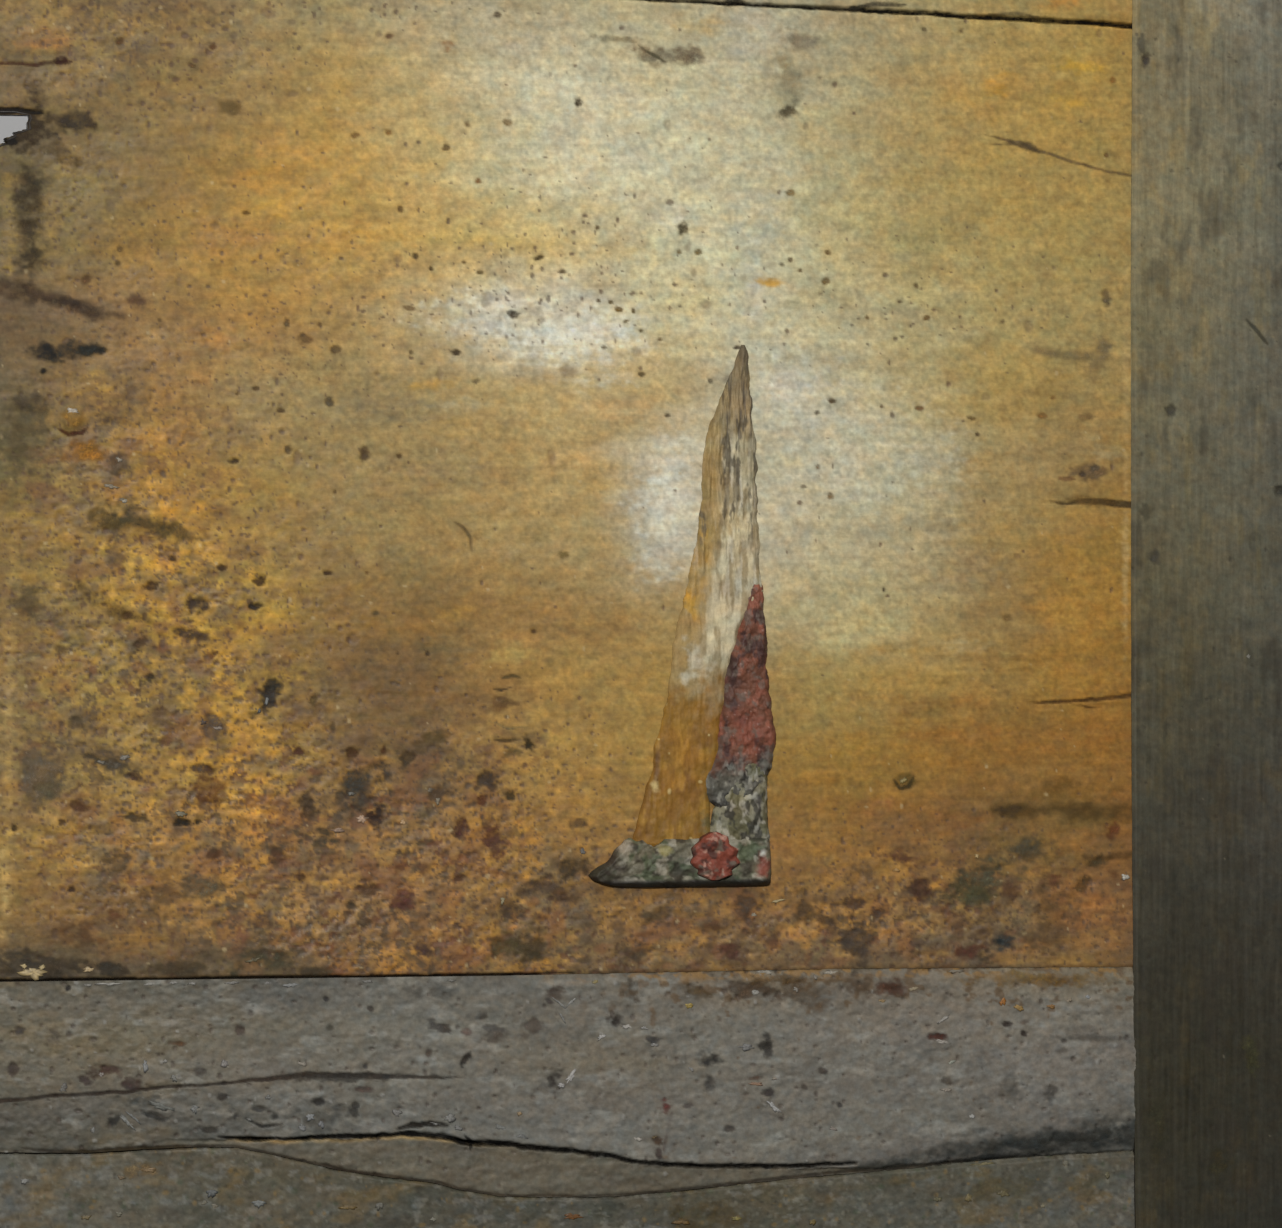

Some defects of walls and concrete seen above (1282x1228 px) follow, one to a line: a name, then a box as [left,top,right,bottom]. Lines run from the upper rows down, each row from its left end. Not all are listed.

crack [644,0,1131,29]
damp [0,92,97,154]
damp [14,166,42,268]
damp [0,285,100,318]
damp [39,340,106,373]
corrosion [188,599,208,613]
corrosion [174,628,207,640]
corrosion [251,679,281,719]
corrosion [299,748,415,846]
corrosion [477,771,515,805]
crack [0,1072,449,1103]
crack [38,1121,968,1197]